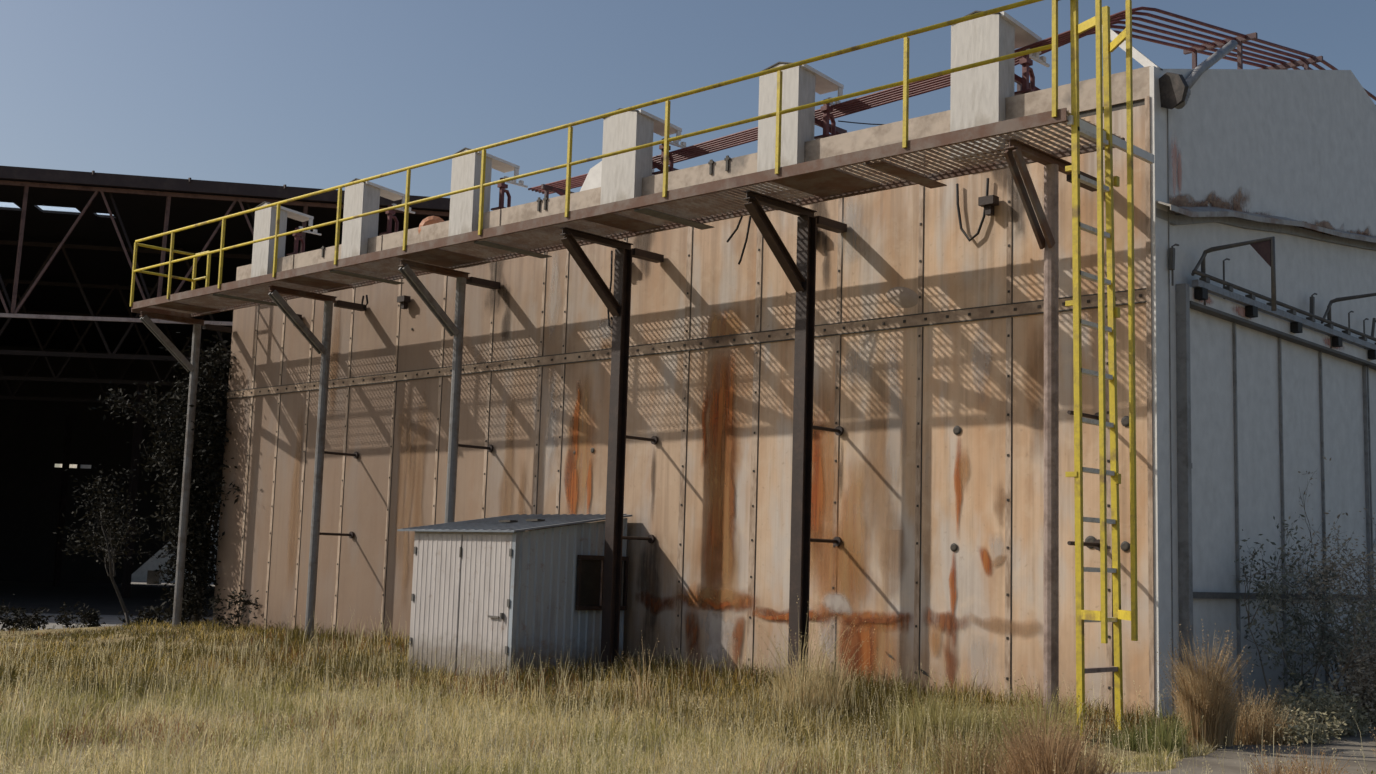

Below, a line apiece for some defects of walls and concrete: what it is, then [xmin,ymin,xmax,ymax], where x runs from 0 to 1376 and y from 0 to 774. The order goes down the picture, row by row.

corrosion [565,389,591,514]
corrosion [702,365,734,582]
corrosion [954,450,968,526]
corrosion [755,608,789,623]
corrosion [809,421,908,683]
corrosion [927,558,962,686]
corrosion [980,549,1003,574]